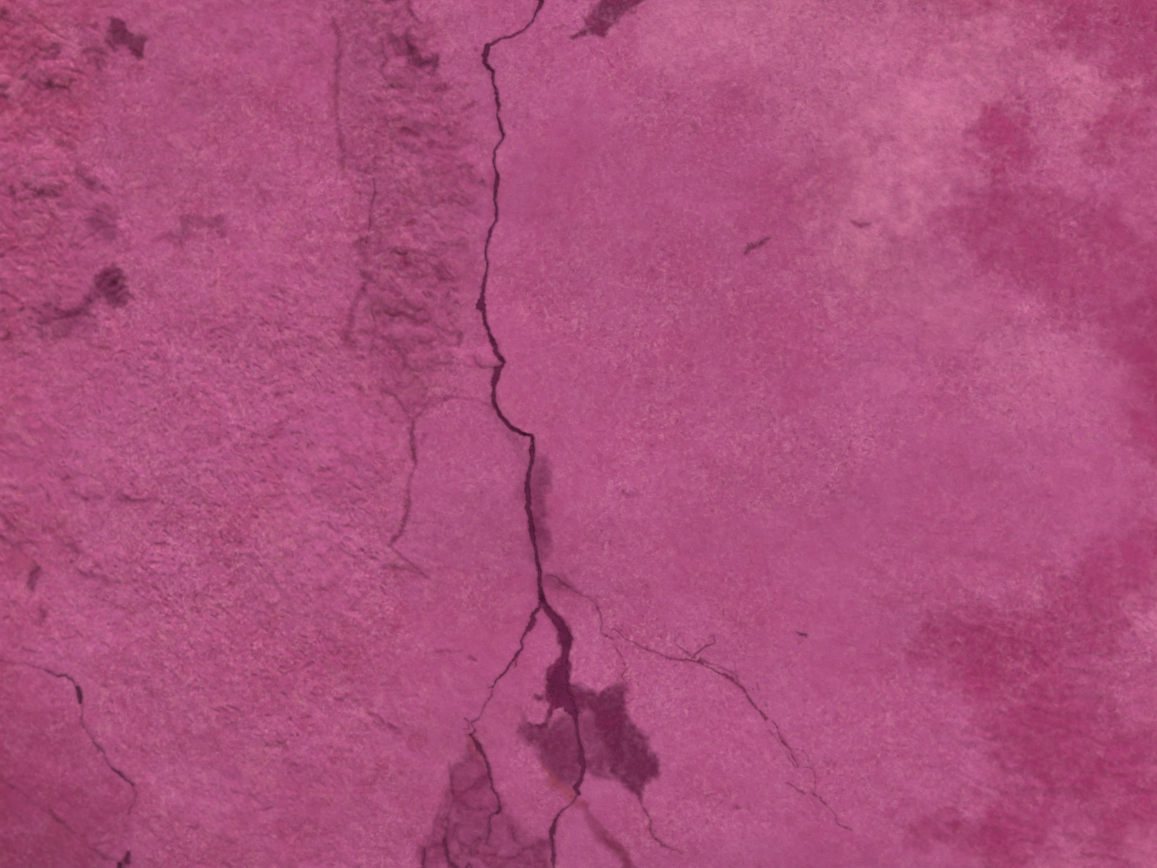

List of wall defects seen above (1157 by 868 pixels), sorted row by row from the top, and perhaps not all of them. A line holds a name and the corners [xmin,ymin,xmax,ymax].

crack [476,0,586,868]
crack [60,675,134,785]
crack [469,721,501,840]
damp [528,606,658,799]
crack [596,606,798,767]
crack [117,852,130,868]
crack [422,840,470,868]